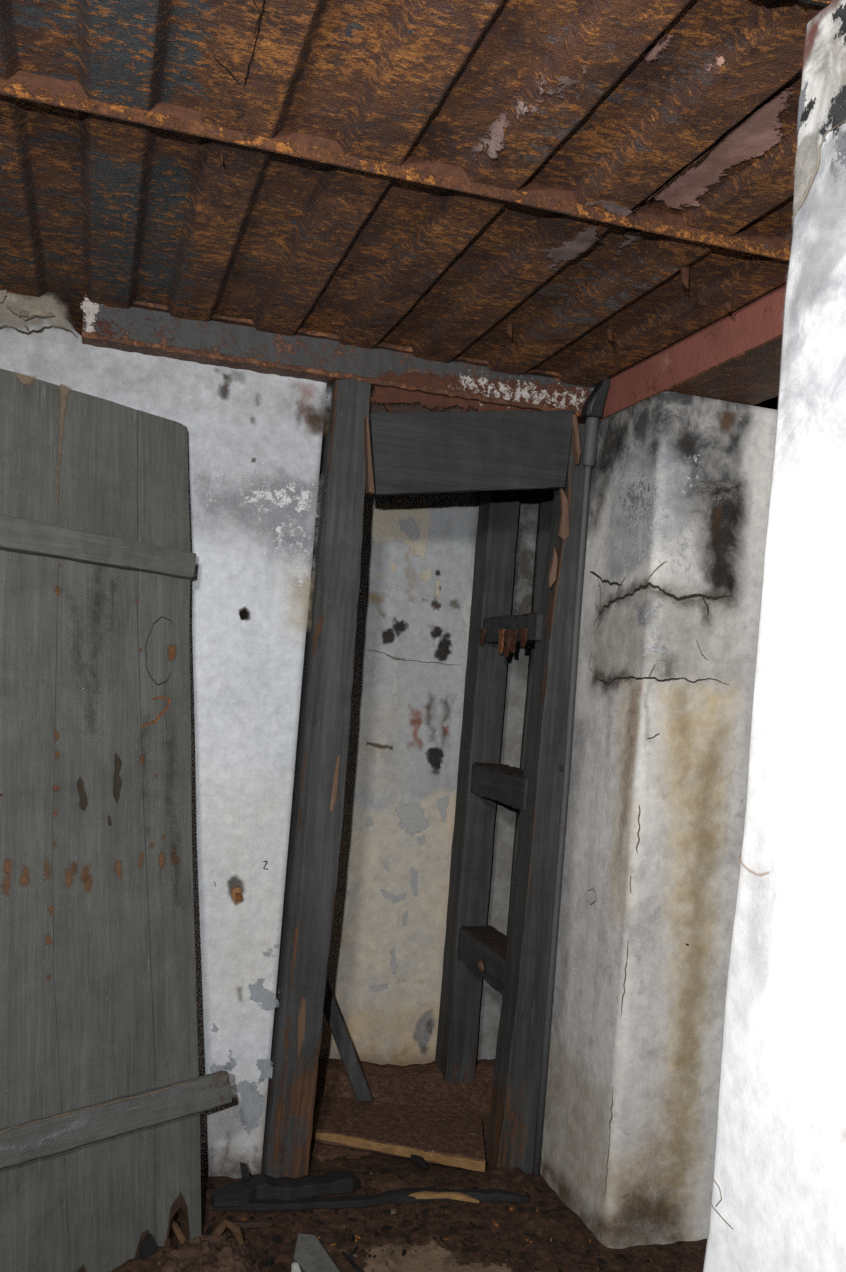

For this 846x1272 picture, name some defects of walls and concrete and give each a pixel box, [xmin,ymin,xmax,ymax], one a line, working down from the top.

spalling [0,290,102,332]
peeling [370,369,593,421]
water stain [432,570,459,609]
water stain [382,620,407,644]
water stain [431,627,451,661]
crack [589,561,731,685]
water stain [593,671,626,690]
water stain [427,748,443,774]
peeling [248,978,279,1011]
peeling [210,1050,273,1134]